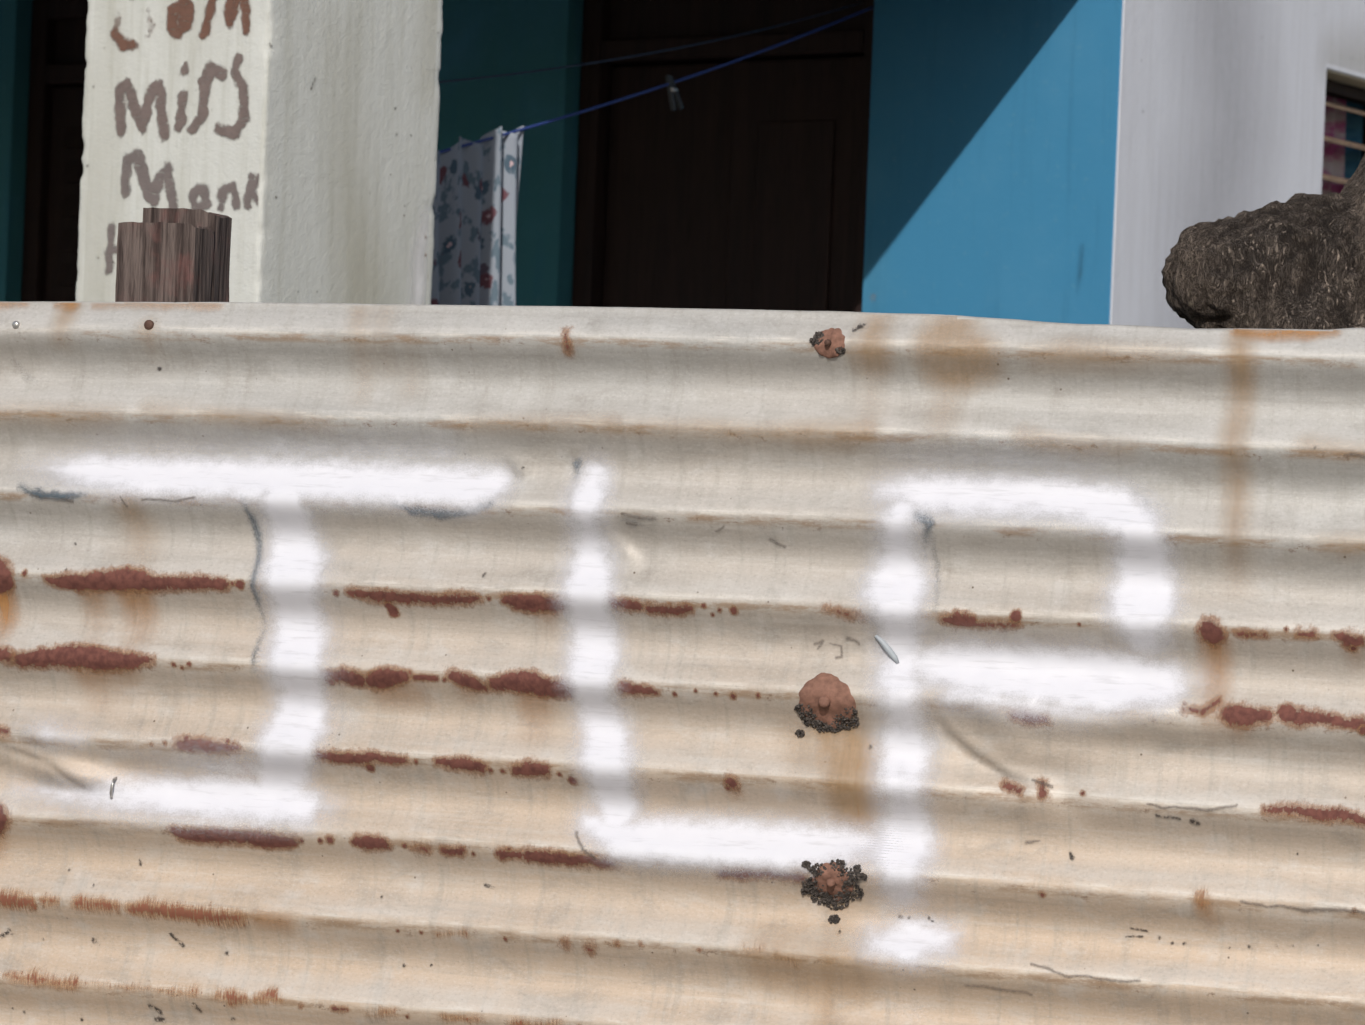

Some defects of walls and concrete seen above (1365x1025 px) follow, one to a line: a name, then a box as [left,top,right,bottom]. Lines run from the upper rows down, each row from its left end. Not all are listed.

corrosion [43,565,245,600]
corrosion [333,588,570,618]
corrosion [941,609,1022,629]
corrosion [0,643,156,672]
corrosion [319,666,575,701]
corrosion [1182,696,1365,735]
corrosion [314,748,418,772]
corrosion [434,756,578,785]
corrosion [1261,803,1365,826]
corrosion [167,825,334,851]
corrosion [350,834,476,857]
corrosion [494,847,616,869]